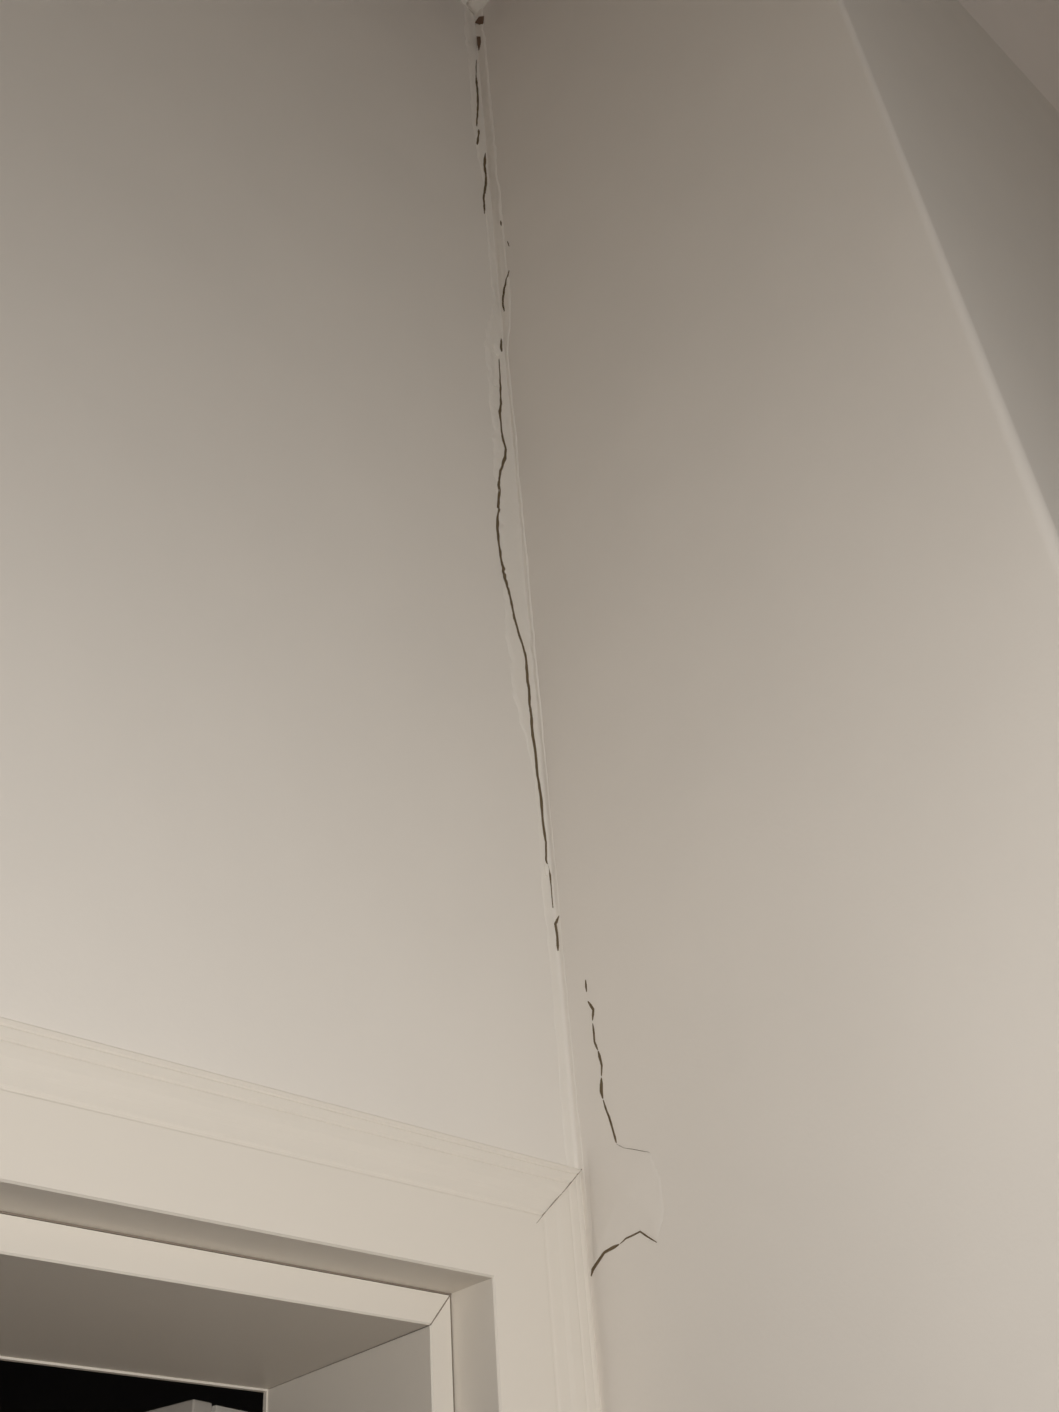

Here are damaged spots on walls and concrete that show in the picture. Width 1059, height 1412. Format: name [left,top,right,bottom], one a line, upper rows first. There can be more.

crack [475,60,559,951]
crack [585,980,646,1152]
crack [591,1231,657,1276]